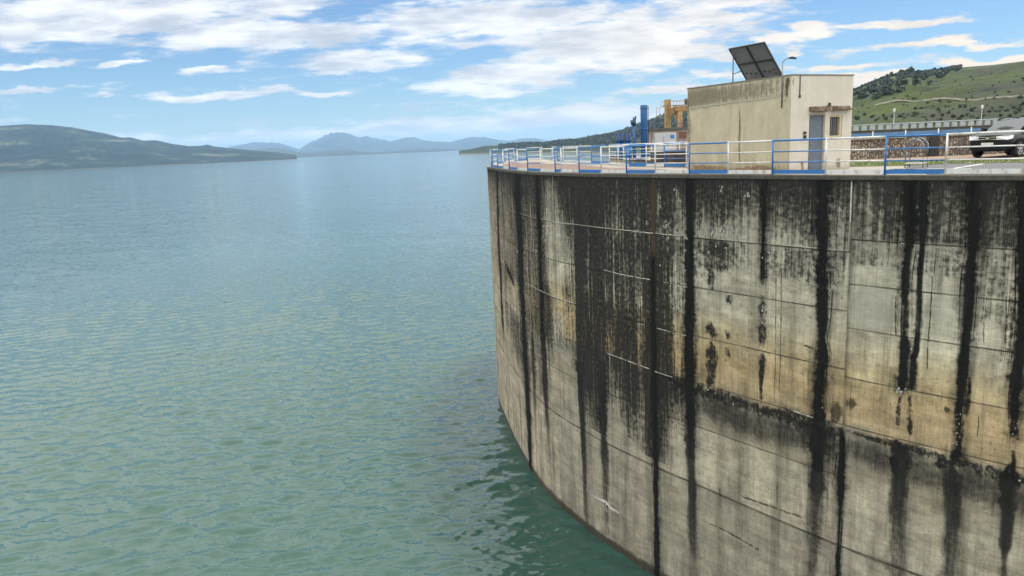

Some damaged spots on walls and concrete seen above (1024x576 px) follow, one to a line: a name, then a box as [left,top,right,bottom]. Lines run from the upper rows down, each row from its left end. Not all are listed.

damp [487,169,1024,576]